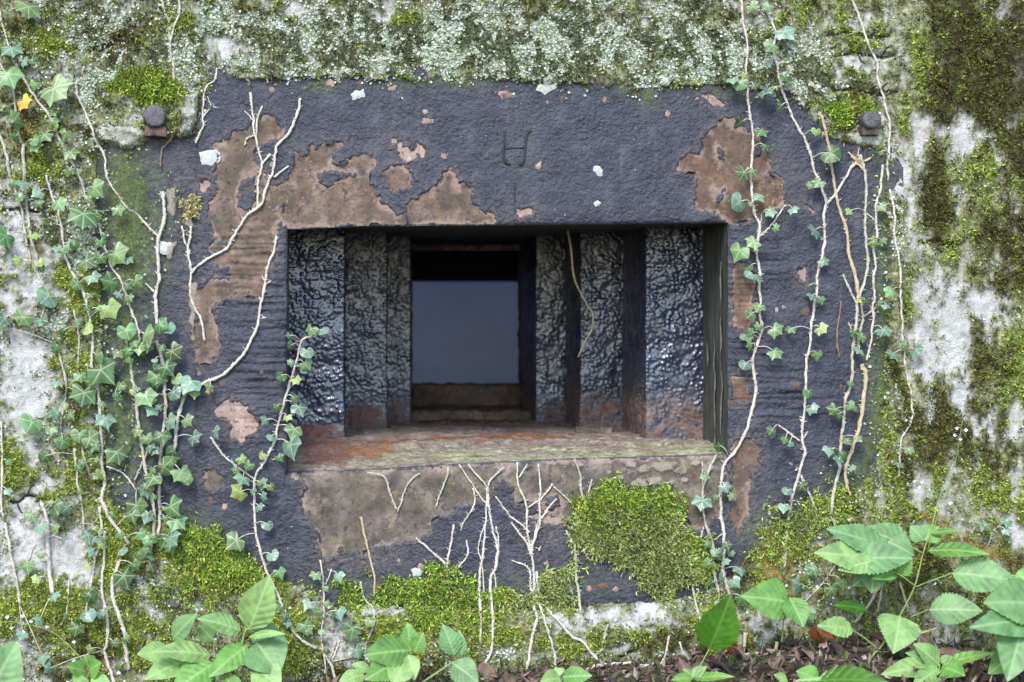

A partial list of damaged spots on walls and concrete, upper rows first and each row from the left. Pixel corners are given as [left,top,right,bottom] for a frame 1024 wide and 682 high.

peeling [676,93,784,225]
peeling [192,115,496,375]
peeling [214,398,258,443]
corrosion [299,418,614,465]
peeling [291,439,761,565]